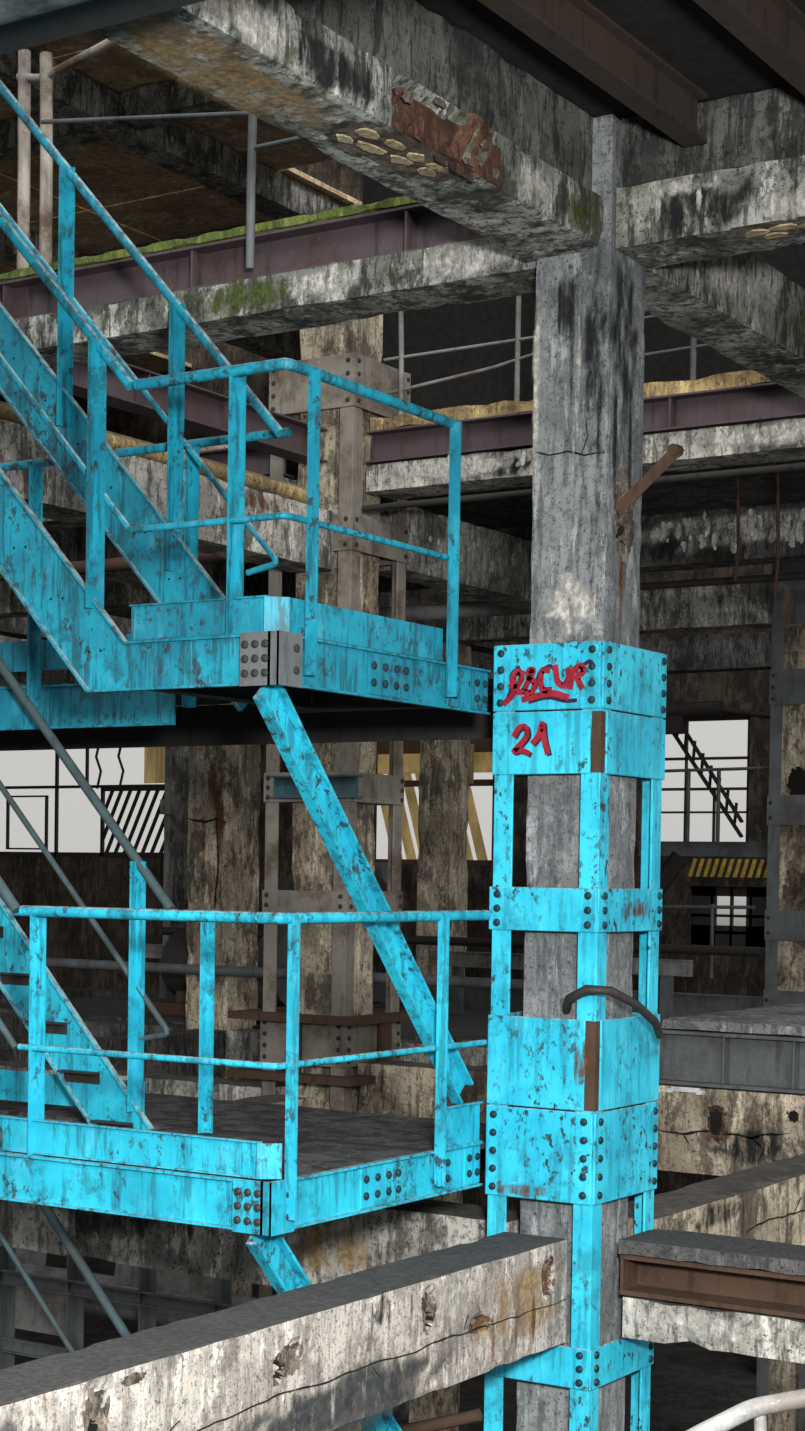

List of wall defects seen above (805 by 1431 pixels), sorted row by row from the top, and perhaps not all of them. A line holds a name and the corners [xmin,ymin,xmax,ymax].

water stain [521,167,552,214]
water stain [281,266,358,298]
water stain [558,257,637,485]
water stain [493,318,541,478]
spalling [703,1105,727,1144]
crack [658,1129,788,1163]
spalling [121,1371,147,1386]
spalling [273,1341,303,1379]
crack [170,1299,566,1431]
spalling [82,1387,110,1431]